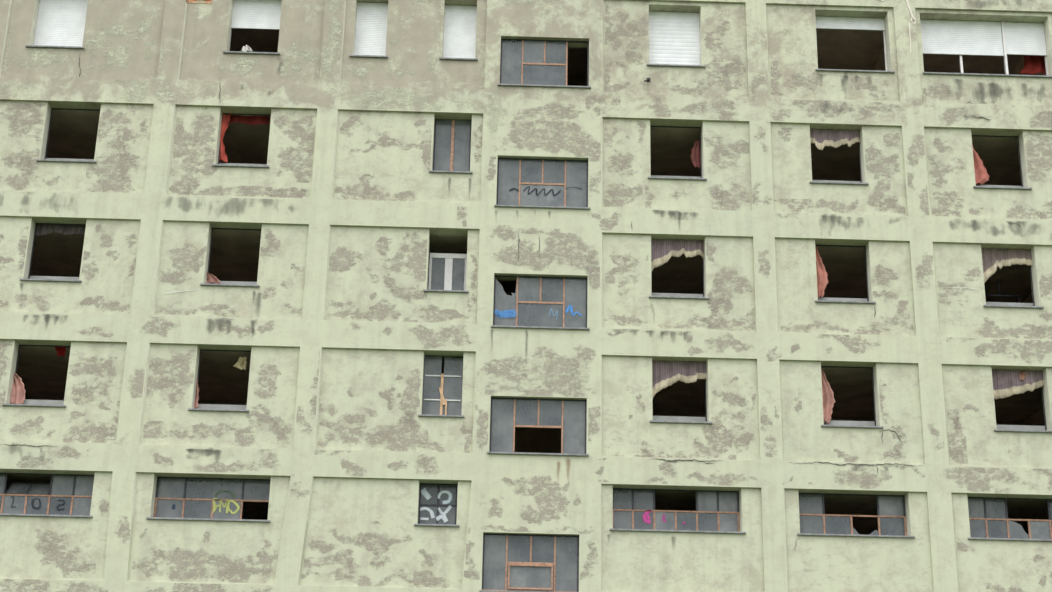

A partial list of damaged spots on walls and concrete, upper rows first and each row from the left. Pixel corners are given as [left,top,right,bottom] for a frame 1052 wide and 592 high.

peeling [651,21,782,120]
peeling [170,108,315,198]
peeling [509,104,654,229]
peeling [329,232,477,349]
peeling [494,228,636,295]
peeling [132,350,193,405]
peeling [143,364,444,476]
peeling [487,476,581,532]
crack [655,457,724,465]
crack [791,429,923,473]
peeling [931,405,1033,493]
peeling [975,314,1052,363]